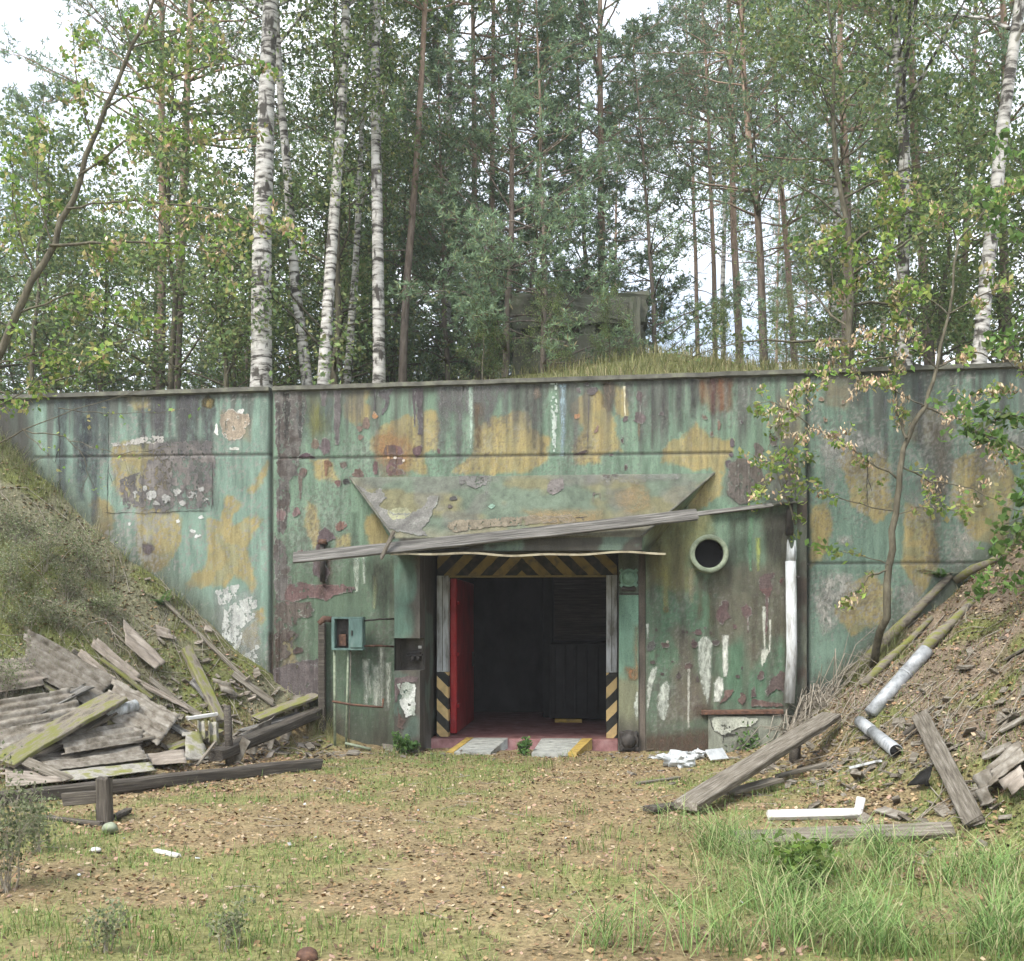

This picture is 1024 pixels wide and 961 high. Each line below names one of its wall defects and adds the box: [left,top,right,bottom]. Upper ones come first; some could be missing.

water stain [438,383,566,457]
peeling [111,409,250,538]
peeling [273,387,576,703]
spalling [215,584,259,663]
spalling [395,676,418,729]
spalling [712,667,785,735]